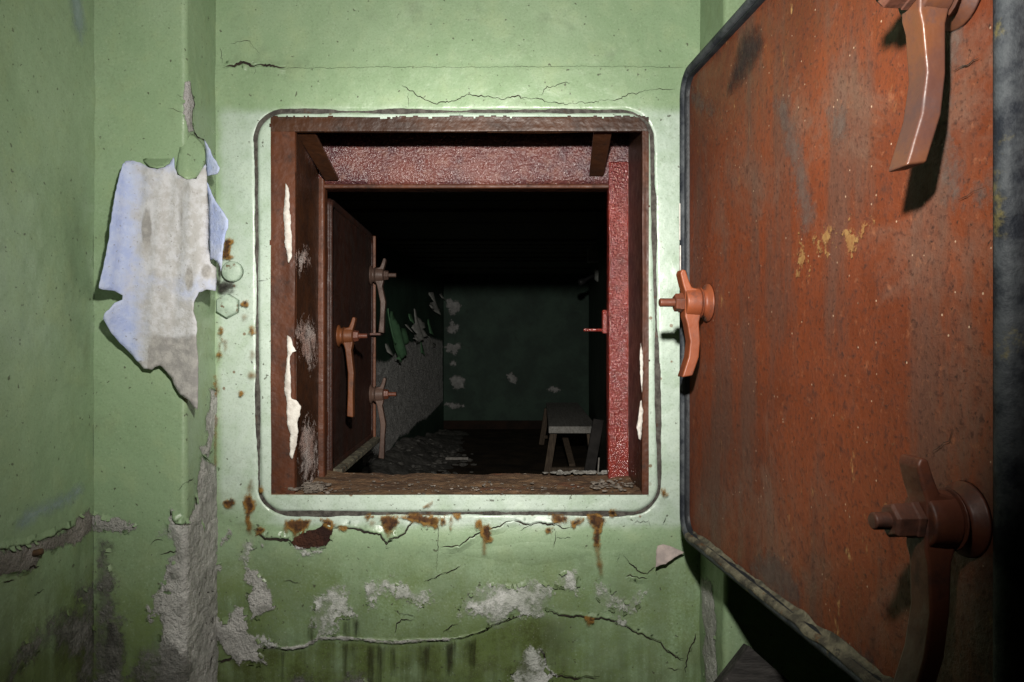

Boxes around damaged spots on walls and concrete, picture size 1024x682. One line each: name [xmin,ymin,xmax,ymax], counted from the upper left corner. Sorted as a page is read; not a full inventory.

crack [220,40,679,105]
corrosion [222,238,234,260]
peeling [99,81,450,682]
flaking render [0,508,138,578]
corrosion [223,486,265,535]
crack [253,526,292,542]
crack [332,516,412,549]
corrosion [365,504,461,533]
crack [425,515,570,581]
corrosion [546,509,617,546]
flaking render [458,570,581,628]
flaking render [510,645,557,682]